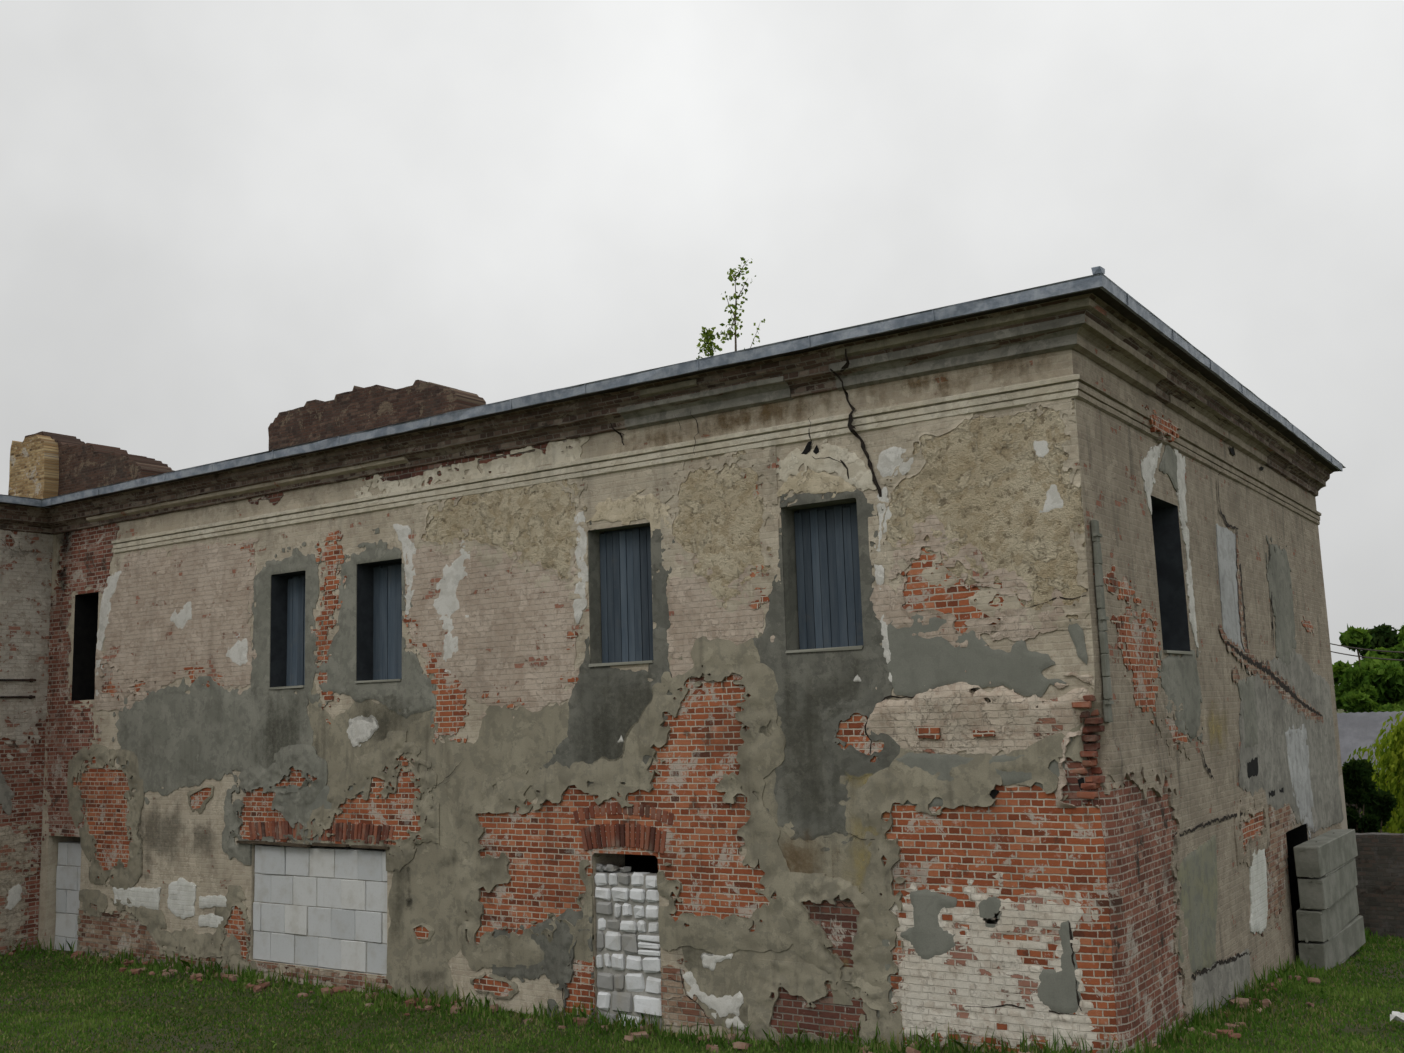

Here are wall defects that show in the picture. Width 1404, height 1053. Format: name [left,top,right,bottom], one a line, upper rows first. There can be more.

crack [808,349,883,510]
flaking render [0,523,393,991]
flaking render [187,398,1203,1053]